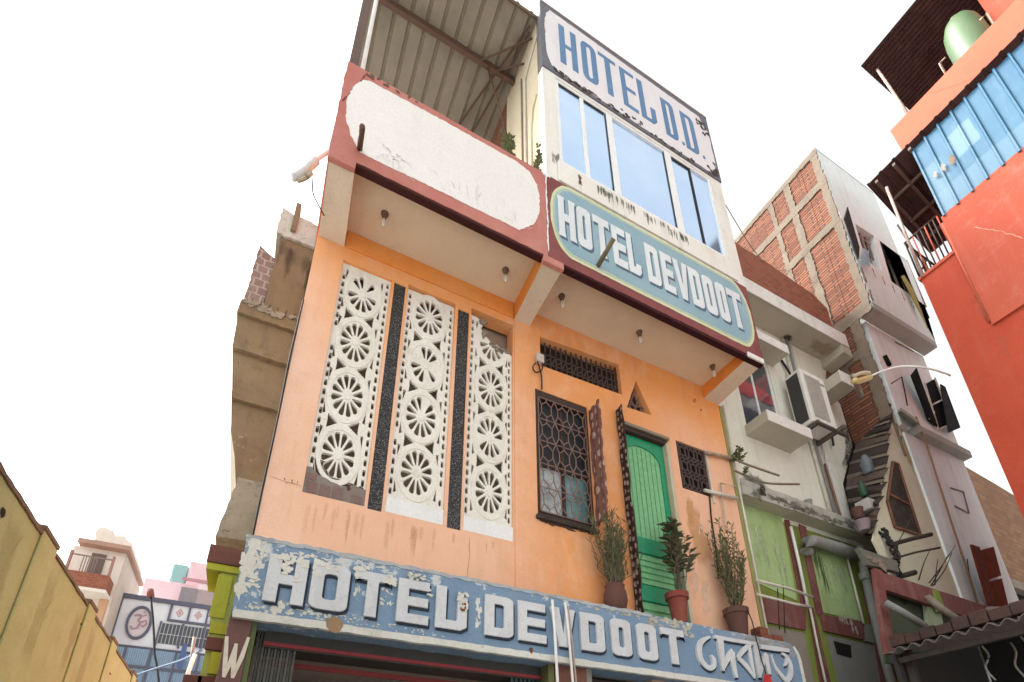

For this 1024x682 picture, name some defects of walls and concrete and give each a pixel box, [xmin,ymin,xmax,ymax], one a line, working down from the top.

leakage [597,186,689,245]
peeling [234,538,445,637]
peeling [456,592,482,628]
peeling [595,607,695,638]